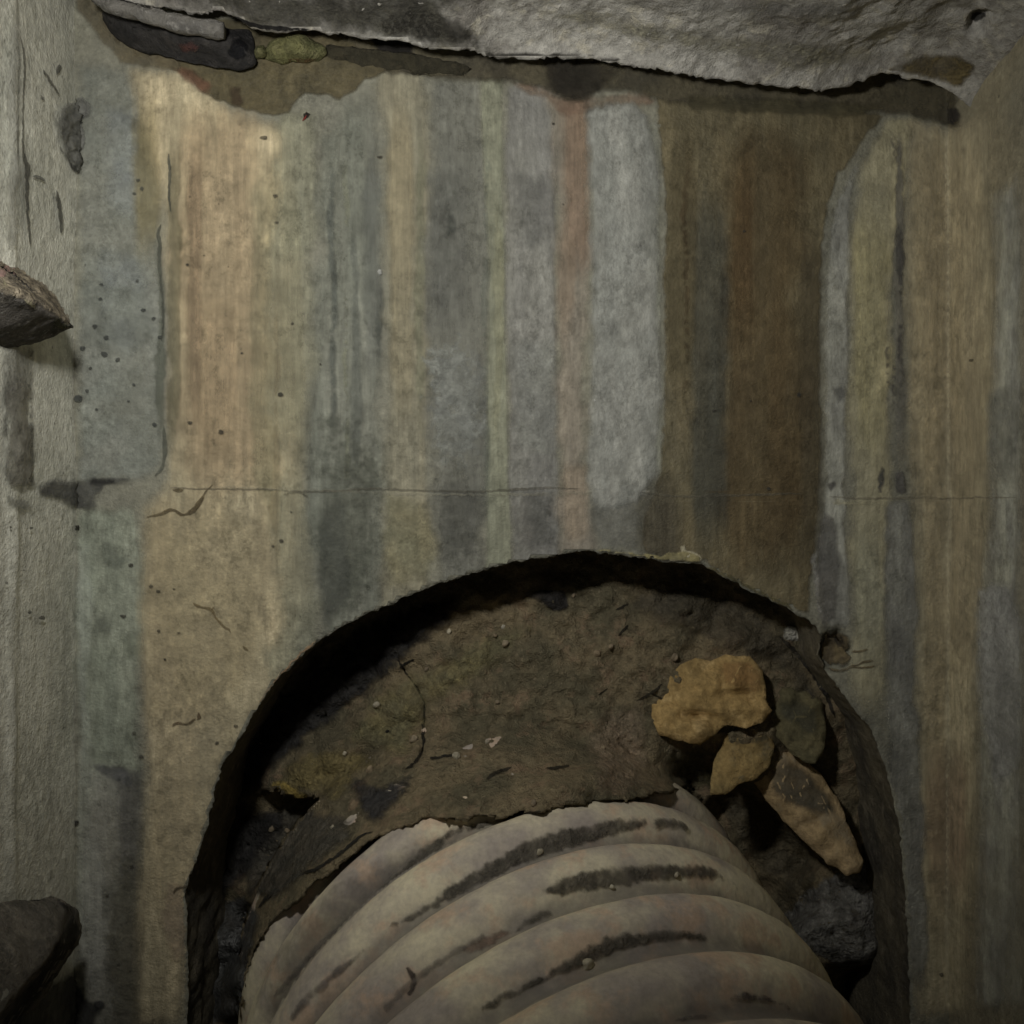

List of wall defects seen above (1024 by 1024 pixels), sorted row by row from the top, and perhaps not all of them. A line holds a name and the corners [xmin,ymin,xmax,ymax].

spalling [102,11,257,71]
leakage [77,0,411,115]
rust [519,83,594,549]
leakage [218,19,974,974]
crack [193,603,248,651]
spalling [600,546,790,608]
leakage [981,192,1020,1003]